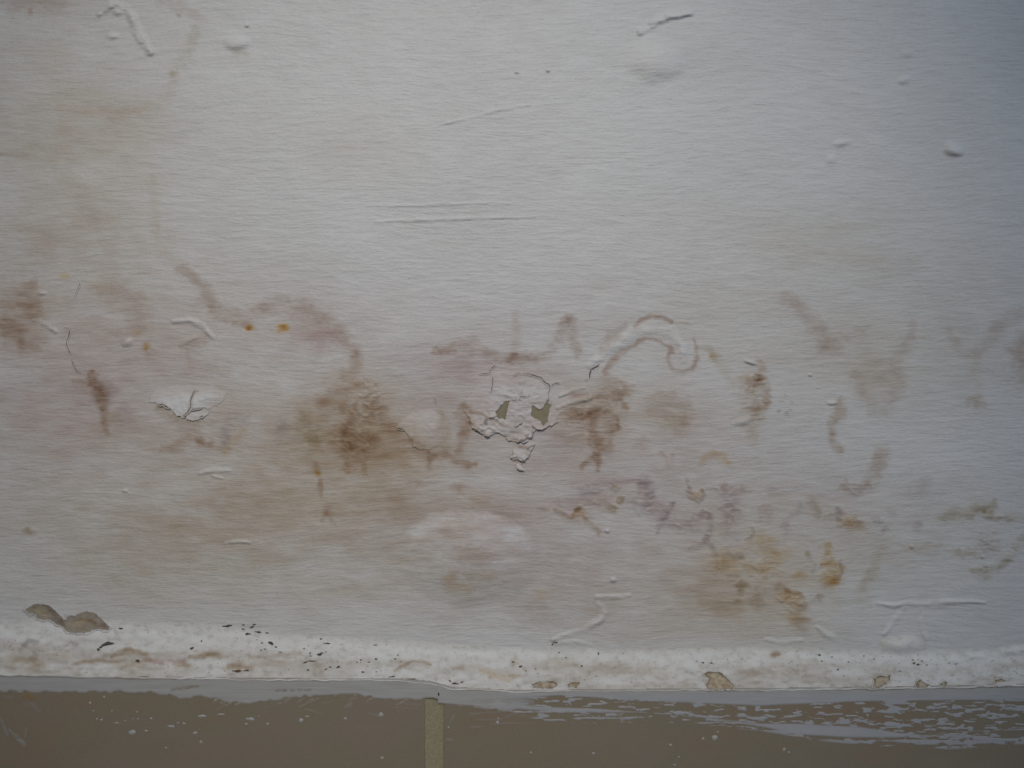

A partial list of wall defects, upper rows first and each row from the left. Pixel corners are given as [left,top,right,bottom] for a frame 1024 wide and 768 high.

damp [0,266,157,368]
damp [143,171,501,527]
damp [69,367,137,438]
peeling [149,385,227,421]
peeling [462,367,570,471]
damp [420,287,1024,638]
flaking render [22,602,112,636]
flaking render [702,670,736,692]